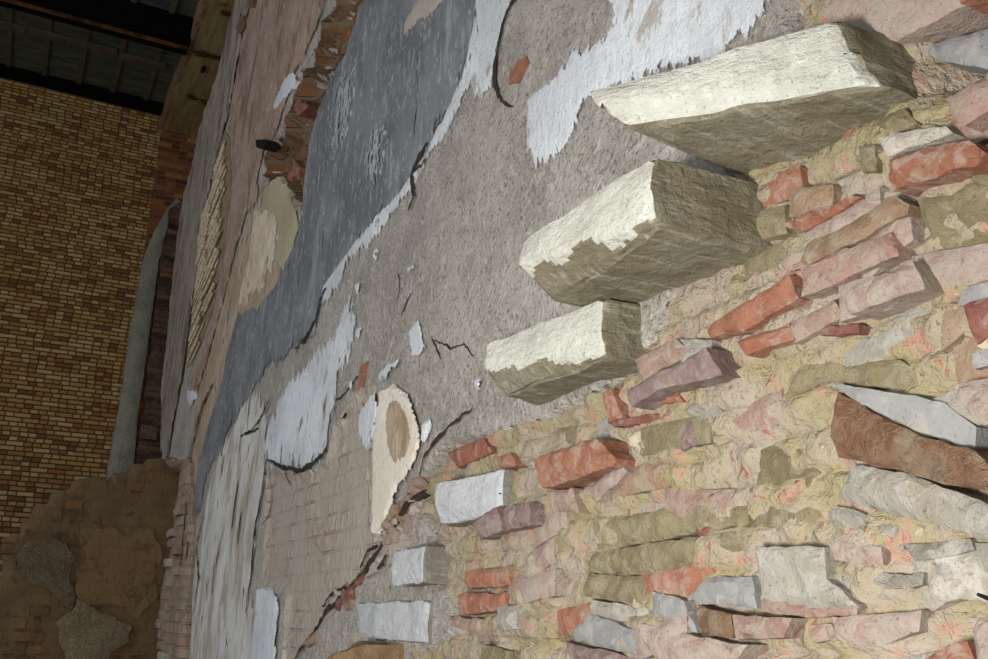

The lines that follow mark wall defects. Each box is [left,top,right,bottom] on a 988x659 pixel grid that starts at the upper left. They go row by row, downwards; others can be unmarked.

peeling [187,390,198,407]
crack [431,336,474,360]
spalling [263,0,988,659]
crack [295,408,472,659]